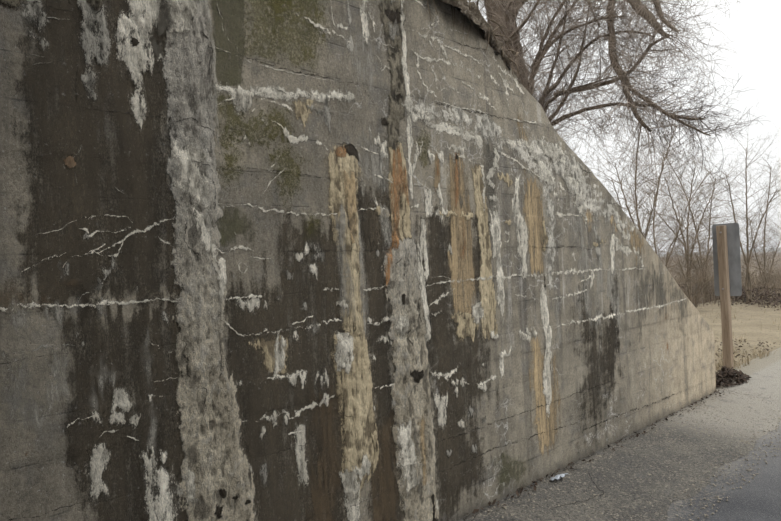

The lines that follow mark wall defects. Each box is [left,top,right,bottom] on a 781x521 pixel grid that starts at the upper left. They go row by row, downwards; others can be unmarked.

water stain [214,82,355,150]
crack [0,298,181,325]
water stain [0,0,189,521]
crack [22,214,171,272]
water stain [223,213,356,521]
water stain [356,126,405,521]
corrosion [433,152,476,314]
corrosion [522,168,545,275]
crack [426,245,643,343]
water stain [401,94,689,521]
corrosion [529,327,561,455]
crack [556,299,685,328]